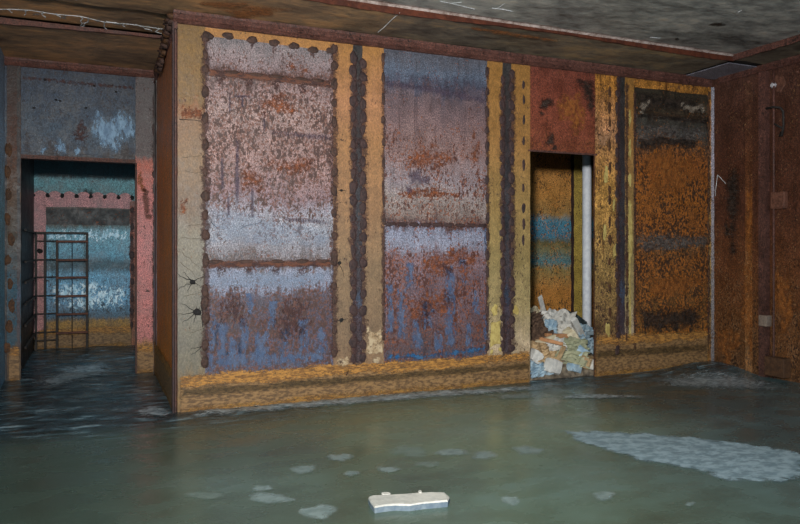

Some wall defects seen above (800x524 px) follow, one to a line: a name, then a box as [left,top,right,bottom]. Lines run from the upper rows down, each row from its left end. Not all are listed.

crack [176,222,220,355]
corrosion [181,31,369,368]
corrosion [381,53,526,352]
damp [637,92,707,150]
corrosion [707,91,753,363]